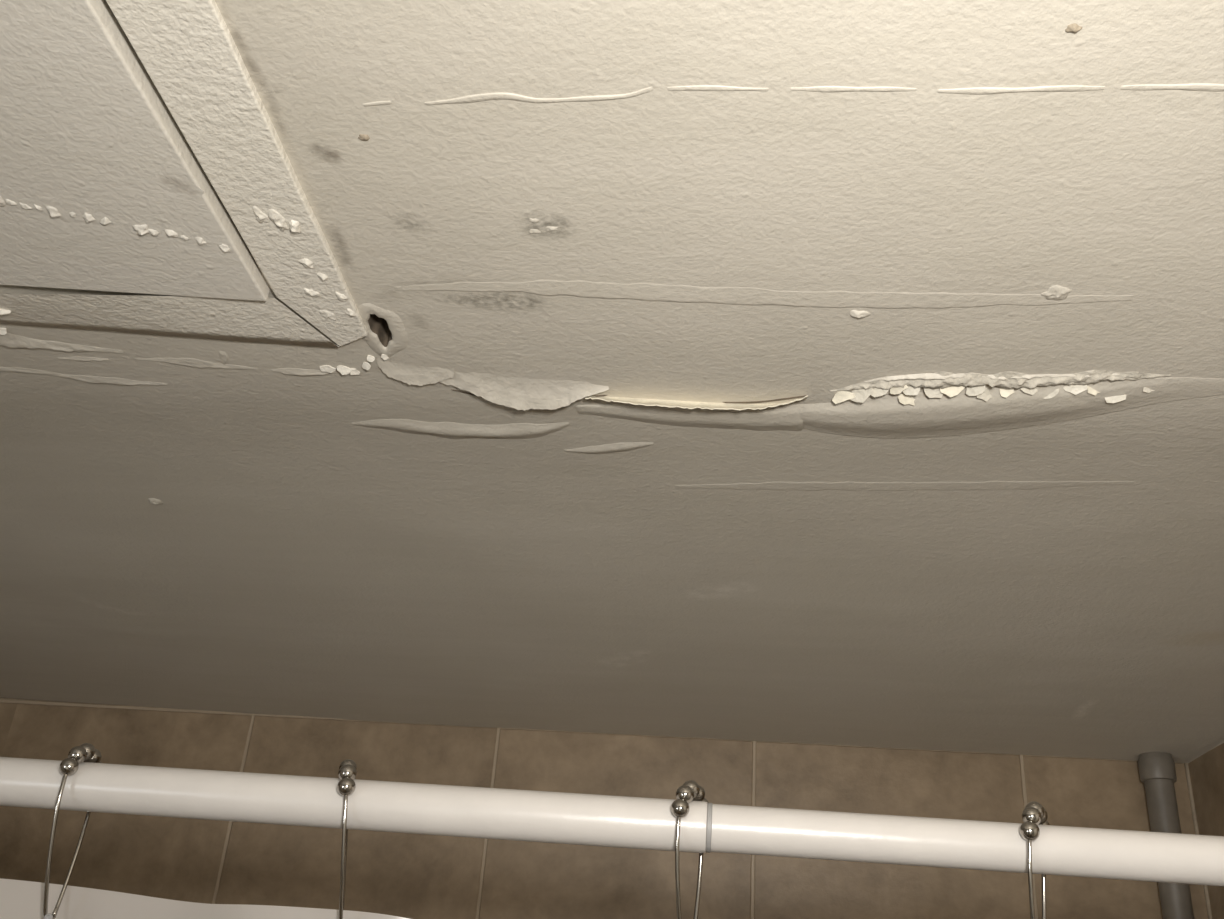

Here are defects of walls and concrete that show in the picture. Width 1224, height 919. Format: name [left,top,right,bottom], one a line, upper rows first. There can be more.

spalling [357,303,408,362]